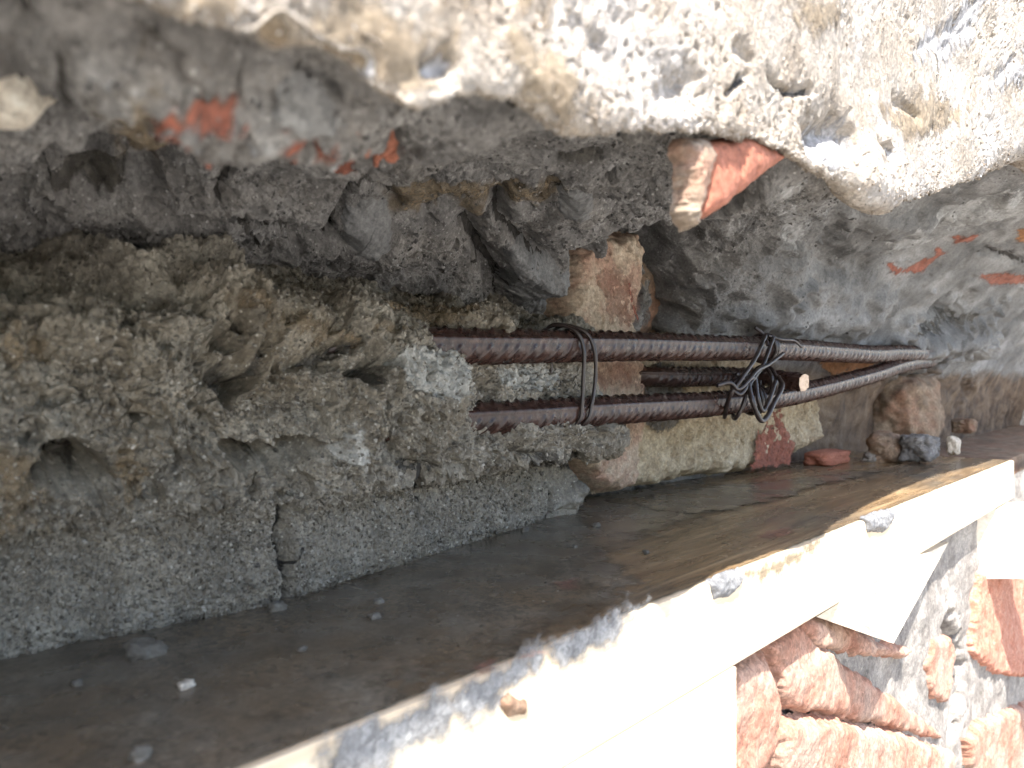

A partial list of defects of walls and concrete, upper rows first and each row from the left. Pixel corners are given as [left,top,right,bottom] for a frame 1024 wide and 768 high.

spalling [48,149,126,193]
spalling [364,130,399,167]
spalling [558,146,603,164]
spalling [801,116,870,171]
spalling [295,338,363,367]
spalling [202,350,266,397]
spalling [344,361,386,386]
spalling [411,283,980,472]
spalling [40,438,72,466]
spalling [395,458,438,472]
crack [271,504,304,571]